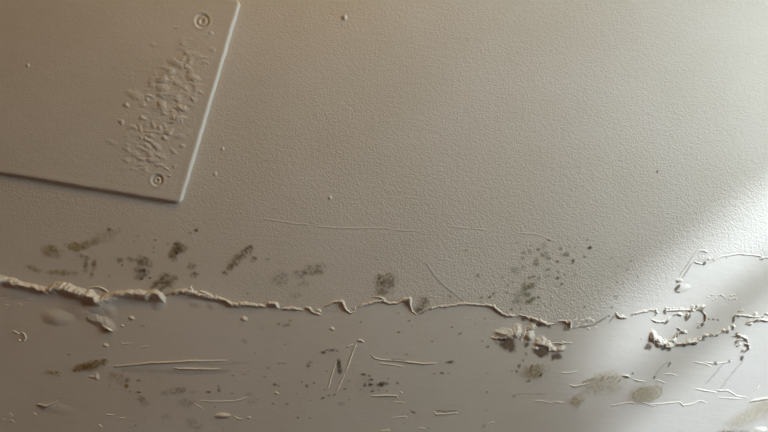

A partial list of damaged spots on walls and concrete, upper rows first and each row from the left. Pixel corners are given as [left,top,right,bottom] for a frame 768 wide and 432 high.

water stain [136,257,169,291]
peeling [675,278,691,294]
peeling [491,323,572,359]
peeling [645,324,750,360]